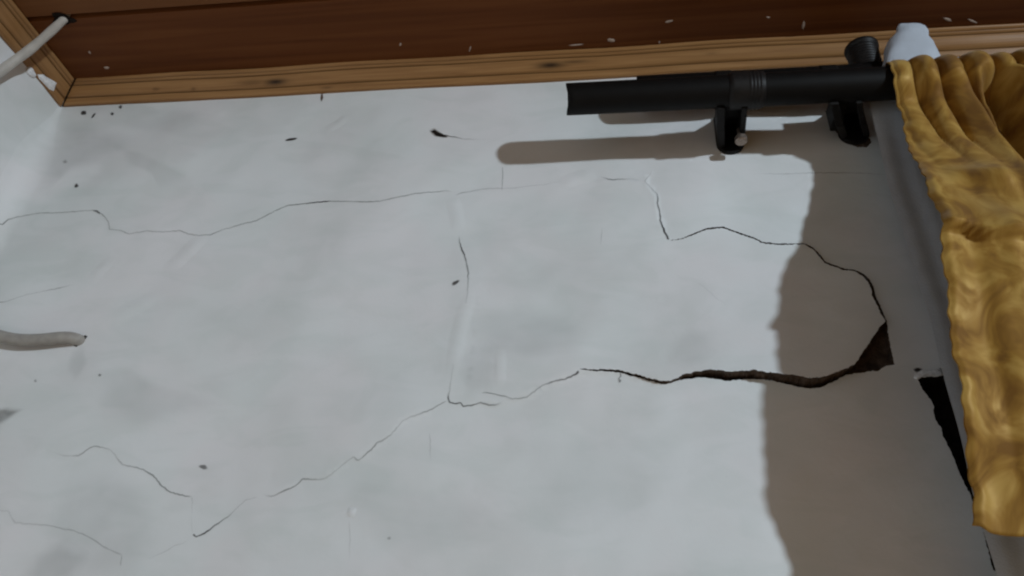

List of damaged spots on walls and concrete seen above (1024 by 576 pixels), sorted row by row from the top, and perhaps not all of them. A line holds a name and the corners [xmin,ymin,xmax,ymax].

crack [657,201,894,388]